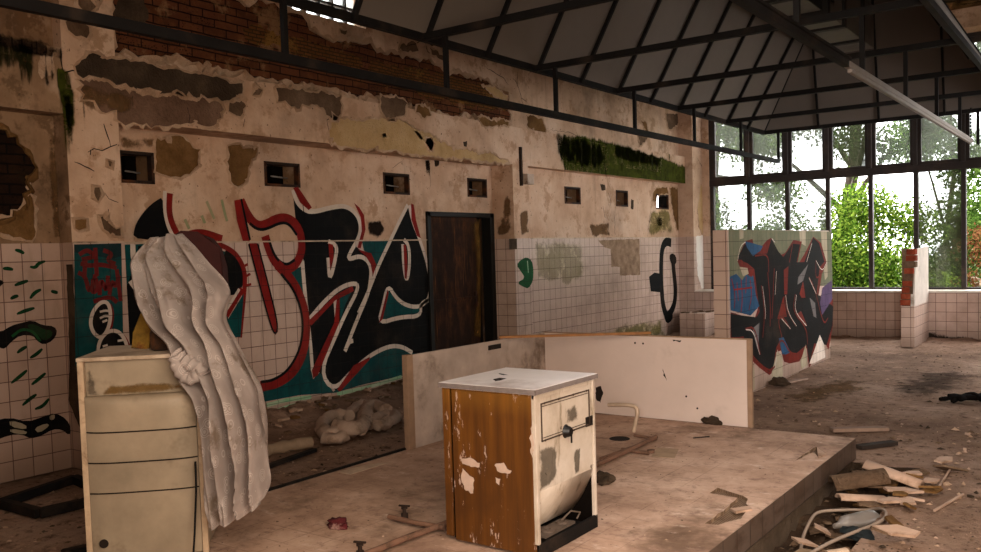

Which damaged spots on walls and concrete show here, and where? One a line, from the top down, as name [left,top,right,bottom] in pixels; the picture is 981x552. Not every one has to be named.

peeling [61,20,93,43]
leakage [0,34,61,80]
flaking render [73,0,513,181]
peeling [526,114,547,133]
flaking render [0,122,39,243]
peeling [223,142,259,190]
peeling [598,239,640,276]
peeling [711,491,747,525]